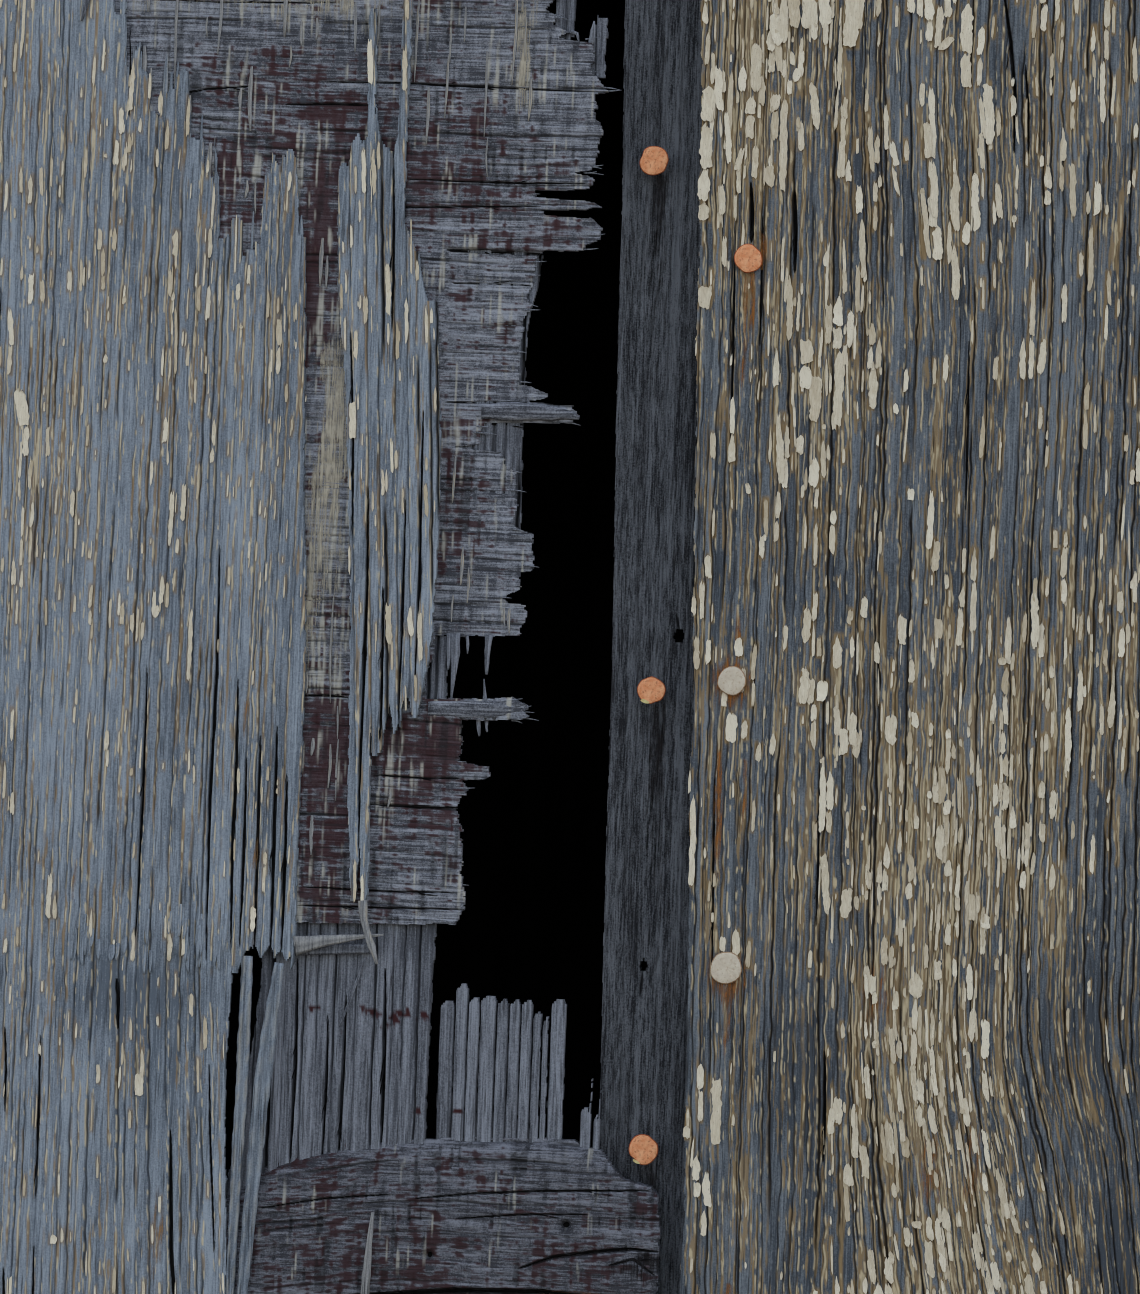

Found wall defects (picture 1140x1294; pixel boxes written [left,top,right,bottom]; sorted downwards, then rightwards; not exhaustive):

peeling [100,59,190,203]
peeling [342,142,381,253]
peeling [20,219,127,335]
rust [743,241,767,329]
peeling [150,155,251,553]
peeling [0,309,107,624]
peeling [45,566,176,663]
peeling [375,602,423,711]
peeling [683,0,1140,1294]
crack [168,1131,176,1294]
crack [262,1190,639,1219]
crack [375,1248,658,1294]